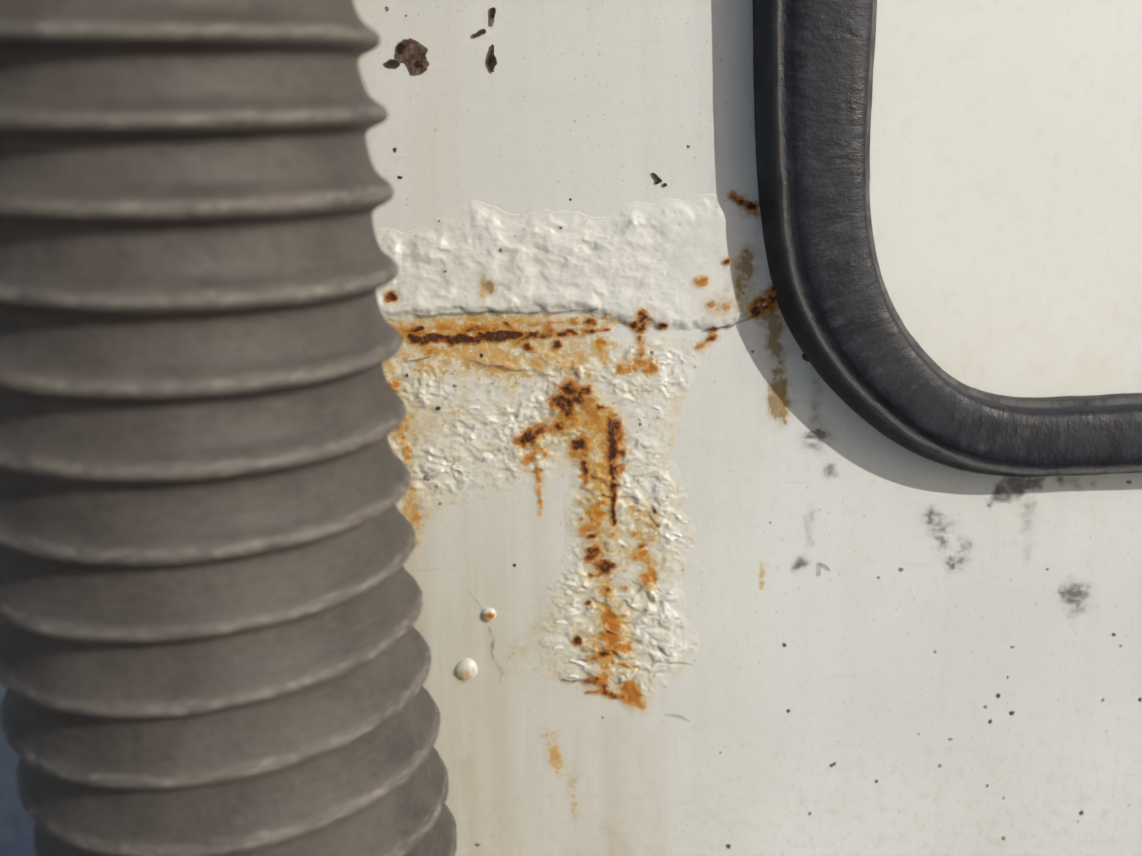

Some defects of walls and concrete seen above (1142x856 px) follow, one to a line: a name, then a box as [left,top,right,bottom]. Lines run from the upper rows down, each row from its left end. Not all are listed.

peeling [384,38,429,75]
peeling [472,7,497,72]
corrosion [729,191,759,215]
corrosion [694,249,789,424]
corrosion [382,308,668,710]